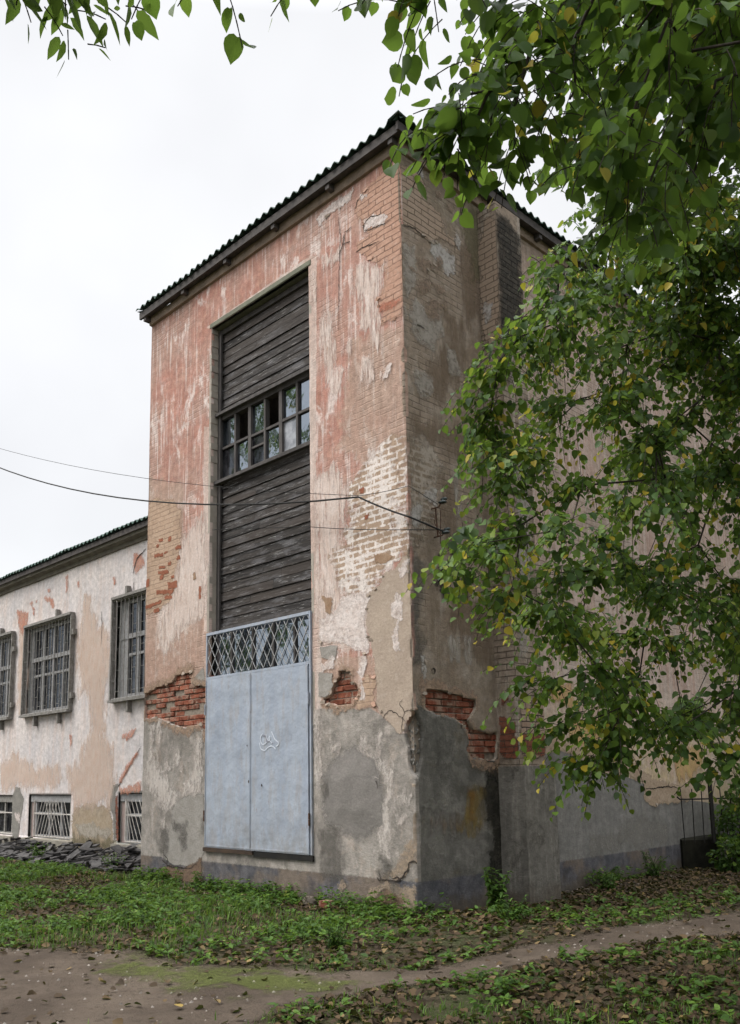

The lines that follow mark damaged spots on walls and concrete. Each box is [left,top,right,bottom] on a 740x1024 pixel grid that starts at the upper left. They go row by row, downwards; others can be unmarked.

peeling [310,246,341,302]
peeling [316,165,461,397]
peeling [133,498,209,654]
peeling [312,434,595,775]
peeling [1,575,212,841]
water stain [313,706,340,805]
water stain [319,827,342,880]
water stain [359,732,412,877]
crack [377,861,417,883]
peeling [602,760,691,807]